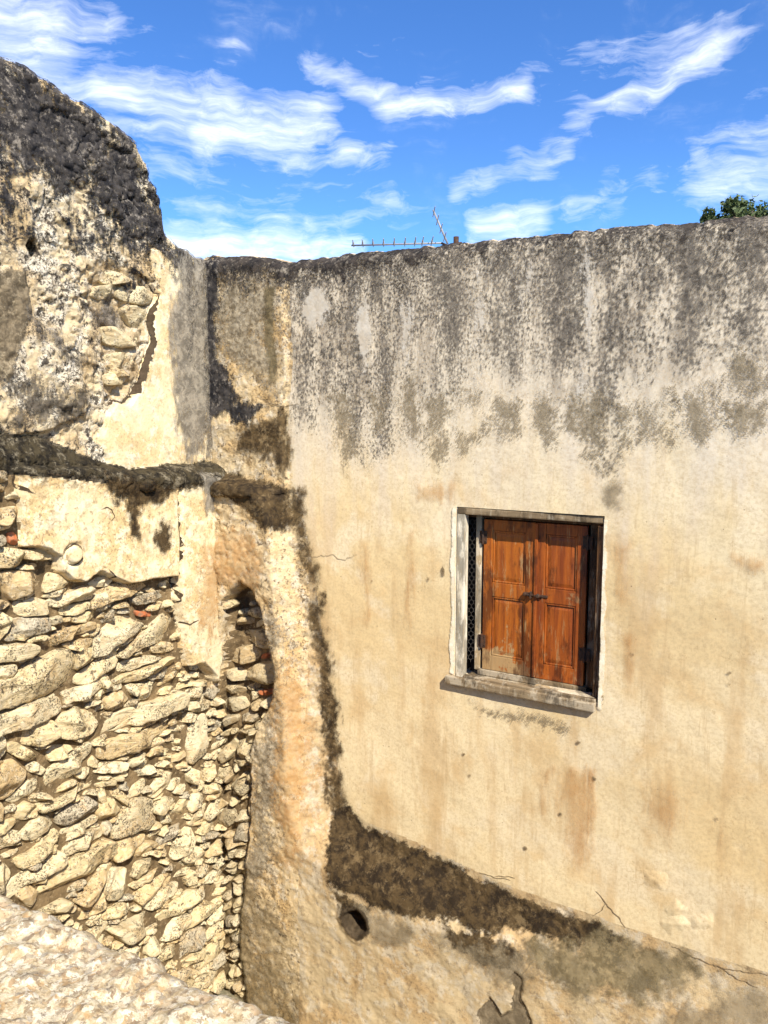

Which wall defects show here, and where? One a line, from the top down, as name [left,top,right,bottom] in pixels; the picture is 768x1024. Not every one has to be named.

flaking render [89,270,153,386]
crack [108,266,160,405]
leakage [166,215,768,514]
leakage [111,483,172,553]
leakage [327,885,371,912]
leakage [443,923,525,969]
peeling [477,971,530,1024]
crack [675,947,766,988]